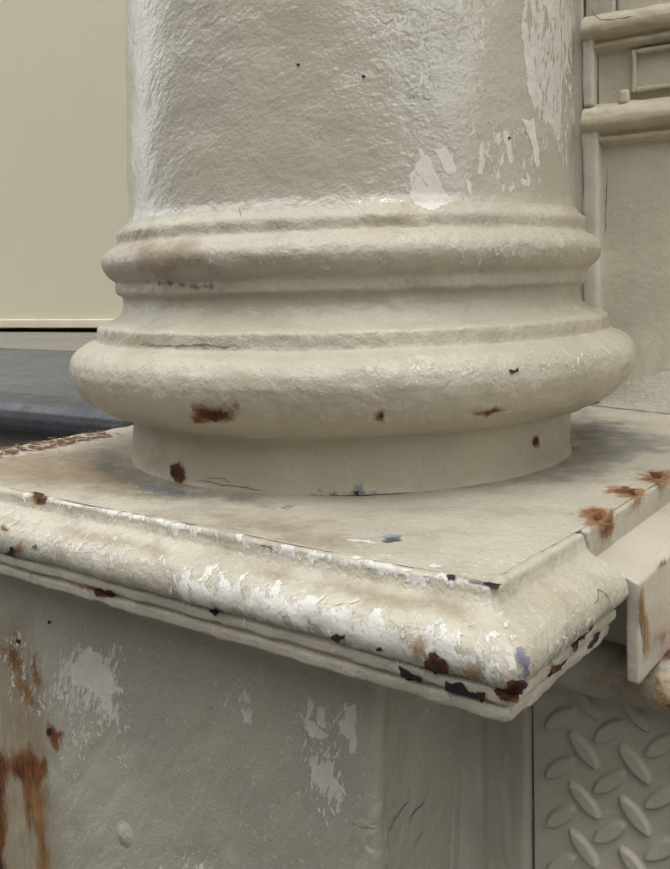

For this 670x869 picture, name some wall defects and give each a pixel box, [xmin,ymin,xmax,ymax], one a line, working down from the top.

peeling [468,0,573,202]
peeling [409,146,457,210]
corrosion [0,430,123,458]
peeling [170,463,187,483]
corrosion [192,405,238,423]
corrosion [607,471,670,509]
corrosion [582,508,615,538]
peeling [1,491,600,703]
peeling [38,636,141,793]
corrosion [654,670,670,711]
corrosion [0,631,61,869]
peeling [286,695,360,838]